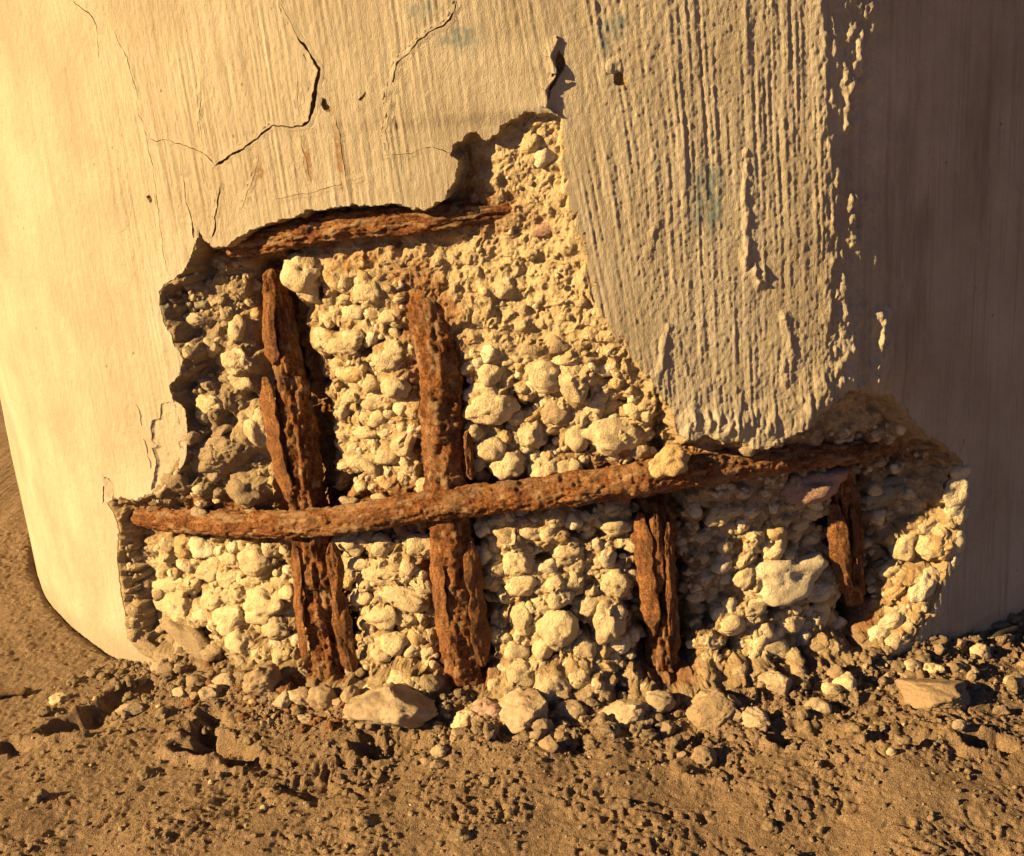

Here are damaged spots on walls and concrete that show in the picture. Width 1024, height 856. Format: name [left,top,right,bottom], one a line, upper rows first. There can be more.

crack [71,0,462,274]
rust [129,150,886,691]
spalling [102,35,971,709]